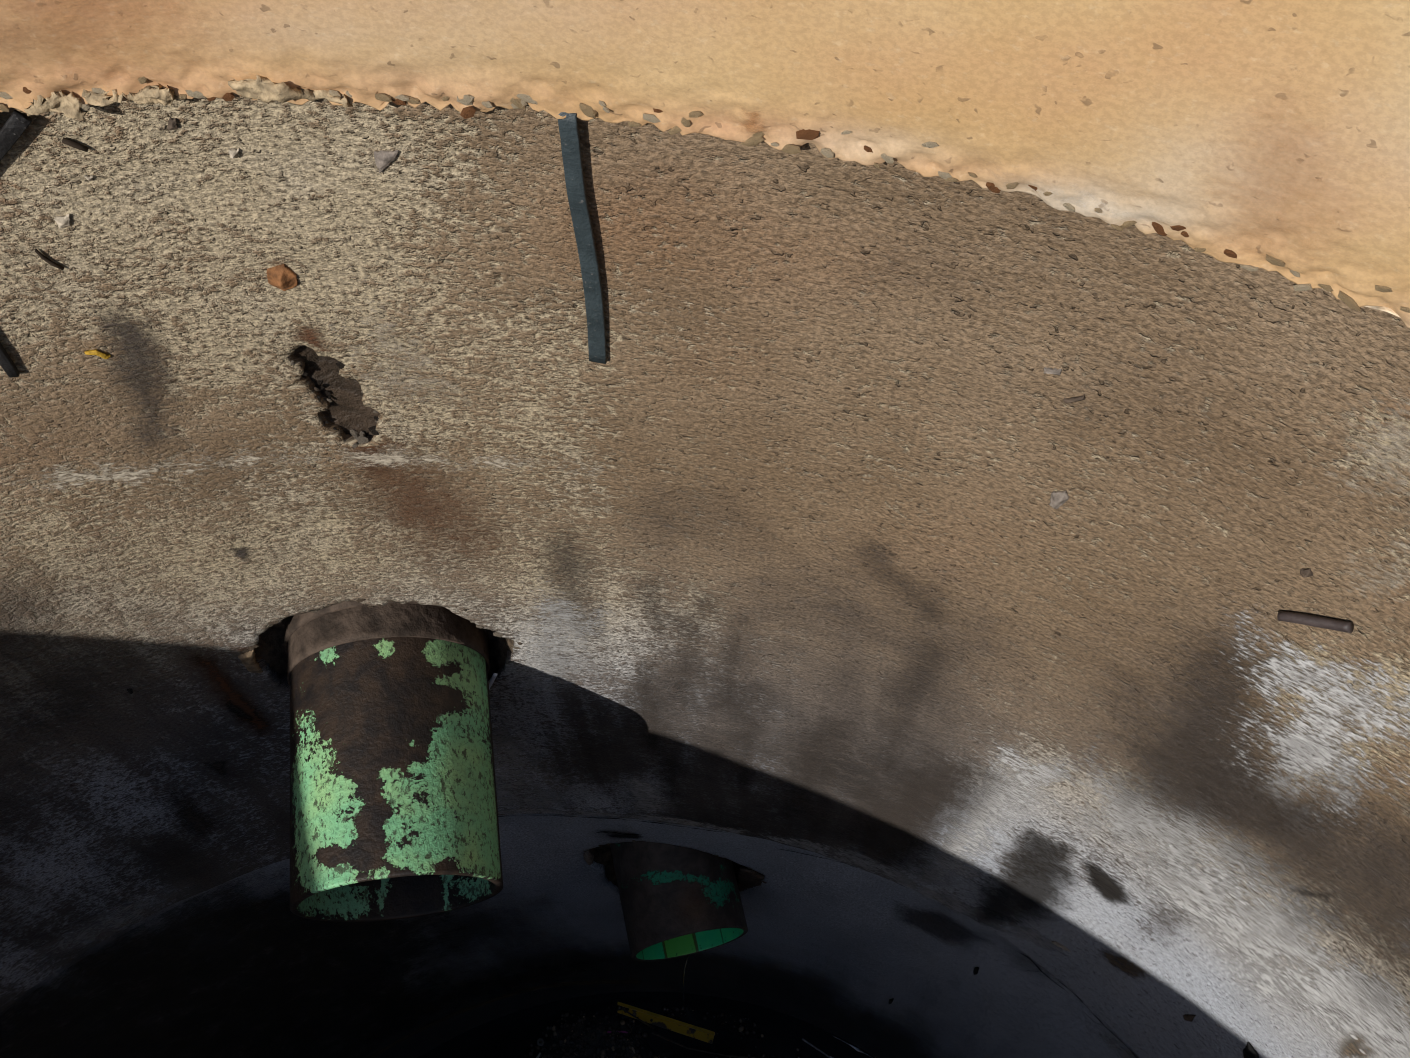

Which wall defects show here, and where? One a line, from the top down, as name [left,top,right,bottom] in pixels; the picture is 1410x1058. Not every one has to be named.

spalling [290,346,380,449]
leakage [766,613,1410,1058]